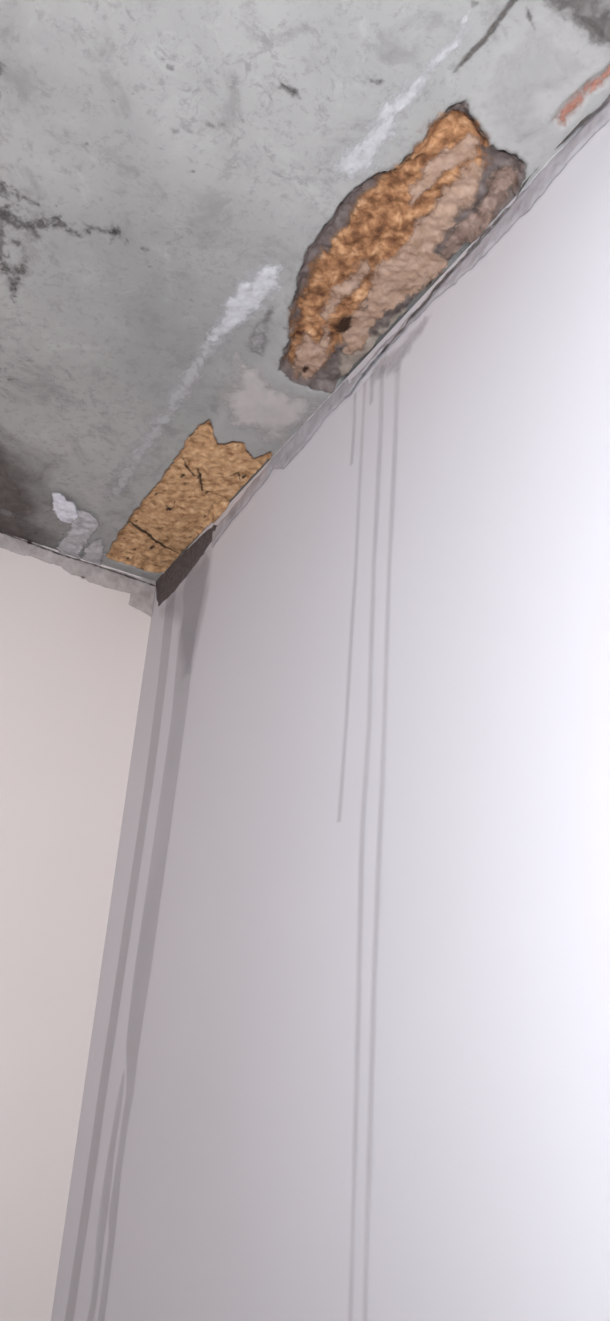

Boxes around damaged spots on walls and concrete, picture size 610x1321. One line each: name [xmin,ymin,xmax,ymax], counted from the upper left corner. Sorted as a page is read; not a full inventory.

spalling [0,66,610,616]